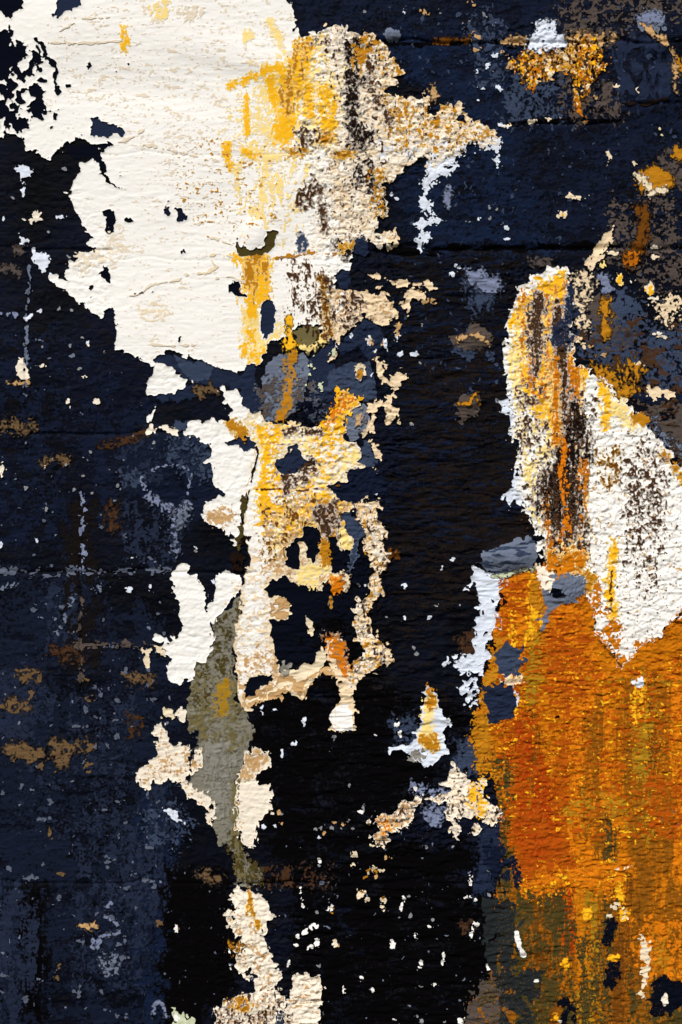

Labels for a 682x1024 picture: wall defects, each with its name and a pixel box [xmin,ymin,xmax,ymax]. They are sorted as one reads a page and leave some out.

peeling [52,0,81,19]
peeling [0,0,71,142]
peeling [66,117,125,188]
peeling [102,209,134,234]
peeling [164,201,188,222]
spalling [235,230,279,257]
peeling [89,265,111,291]
peeling [228,281,247,297]
peeling [260,300,277,339]
peeling [575,292,682,468]
peeling [153,306,388,888]
peeling [481,640,528,724]